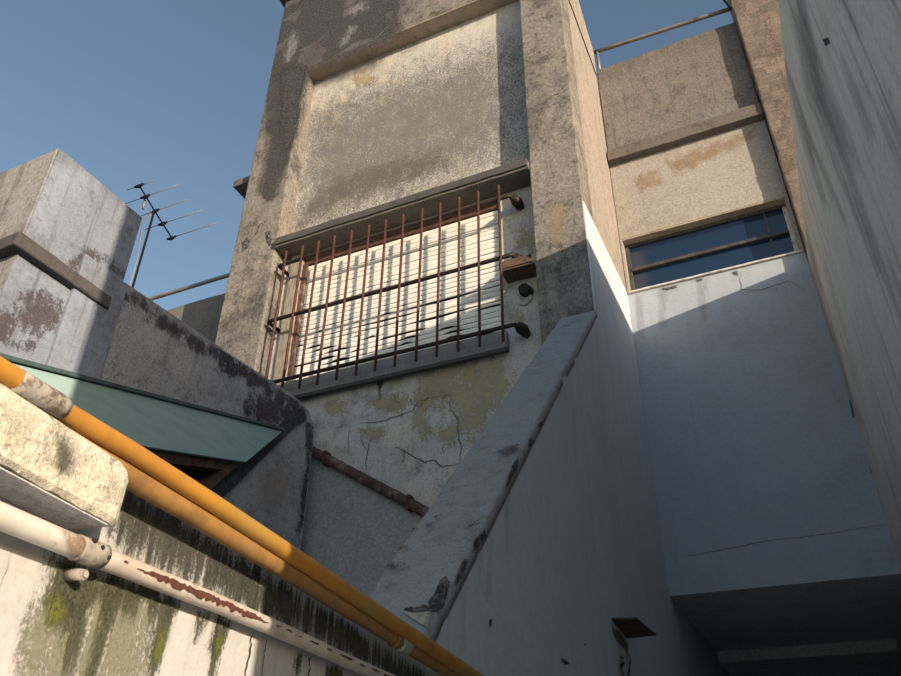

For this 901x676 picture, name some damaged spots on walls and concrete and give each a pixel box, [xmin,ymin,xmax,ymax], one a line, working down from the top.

leakage [258,0,529,230]
leakage [0,289,64,350]
leakage [68,248,125,278]
leakage [124,291,304,425]
crack [740,276,804,292]
leakage [295,422,314,533]
crack [348,388,464,472]
spalling [505,458,518,488]
leakage [43,558,180,676]
leakage [109,490,426,676]
spalling [402,530,487,630]